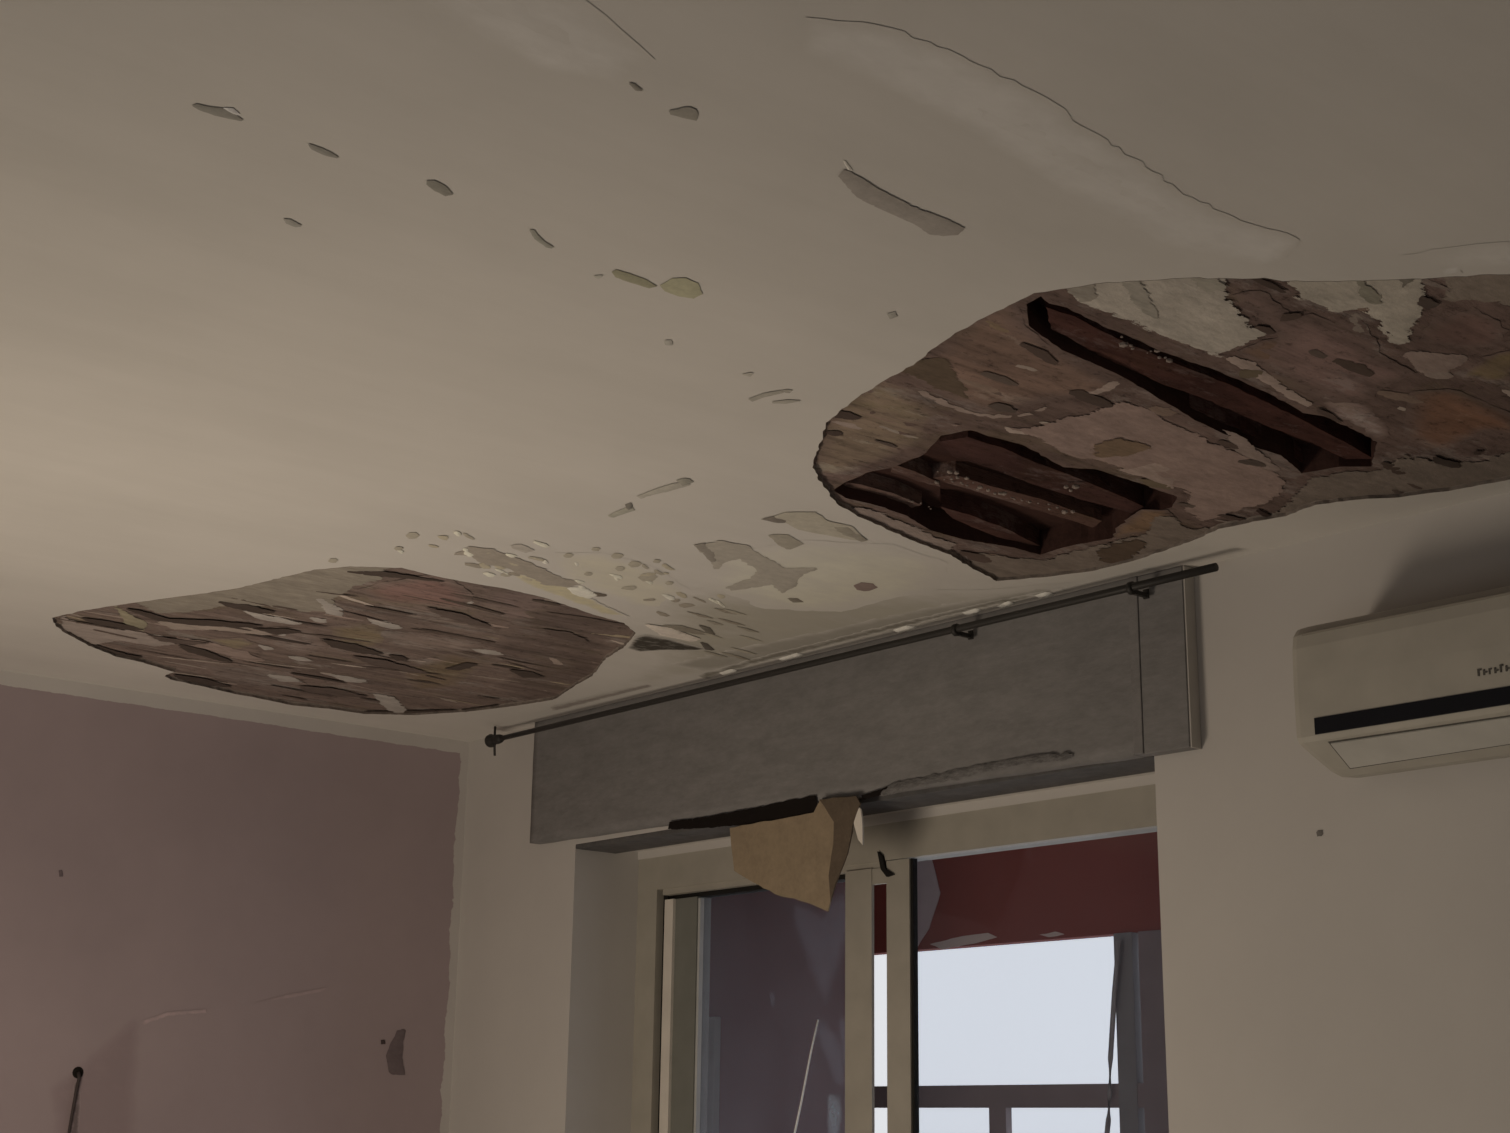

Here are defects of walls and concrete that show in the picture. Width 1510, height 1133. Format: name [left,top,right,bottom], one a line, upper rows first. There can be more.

spalling [192,104,243,121]
spalling [669,107,698,121]
spalling [308,144,339,158]
spalling [426,181,453,196]
spalling [838,161,965,236]
spalling [530,230,554,249]
spalling [594,270,702,299]
peeling [53,442,1510,715]